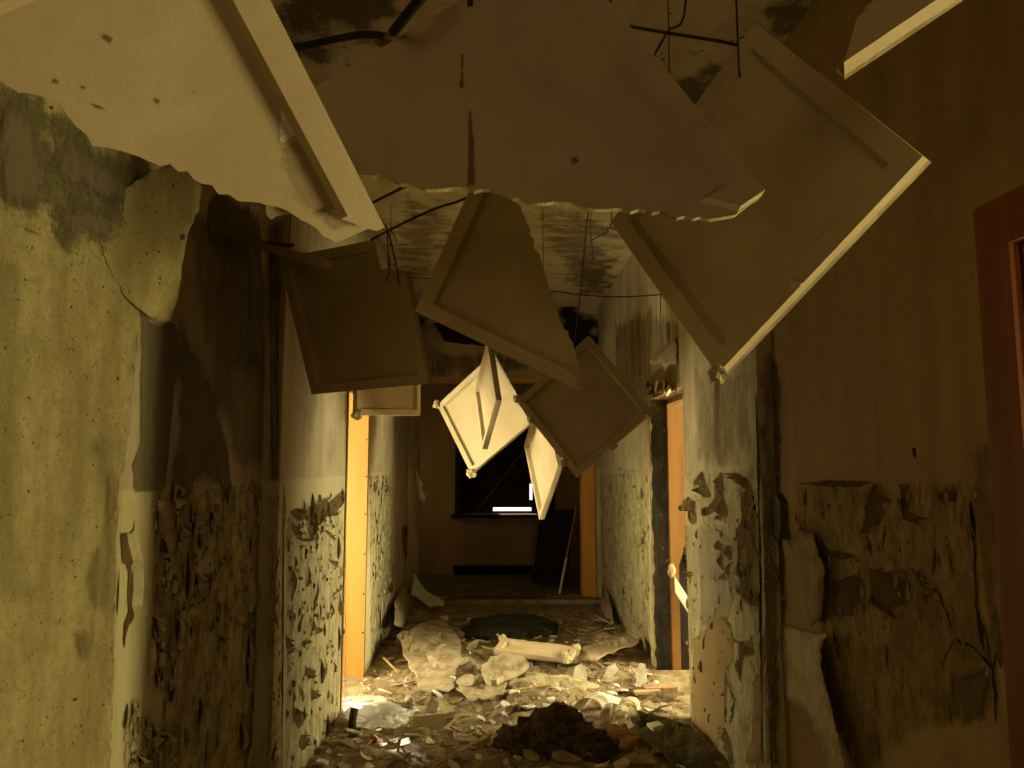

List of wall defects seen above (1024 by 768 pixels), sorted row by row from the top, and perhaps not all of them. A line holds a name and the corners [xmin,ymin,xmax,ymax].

water stain [0,83,155,252]
water stain [541,212,619,294]
peeling [123,478,345,768]
peeling [370,469,412,660]
peeling [678,471,761,768]
peeling [780,480,994,768]